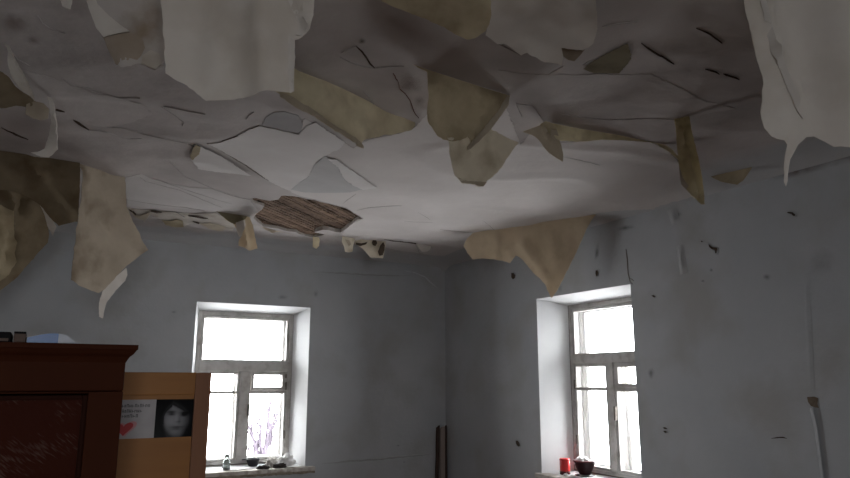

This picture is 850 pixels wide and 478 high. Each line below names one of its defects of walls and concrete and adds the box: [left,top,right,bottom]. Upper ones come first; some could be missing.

crack [340,46,419,118]
crack [641,43,674,65]
crack [705,69,739,80]
crack [55,106,267,224]
peeling [125,109,692,256]